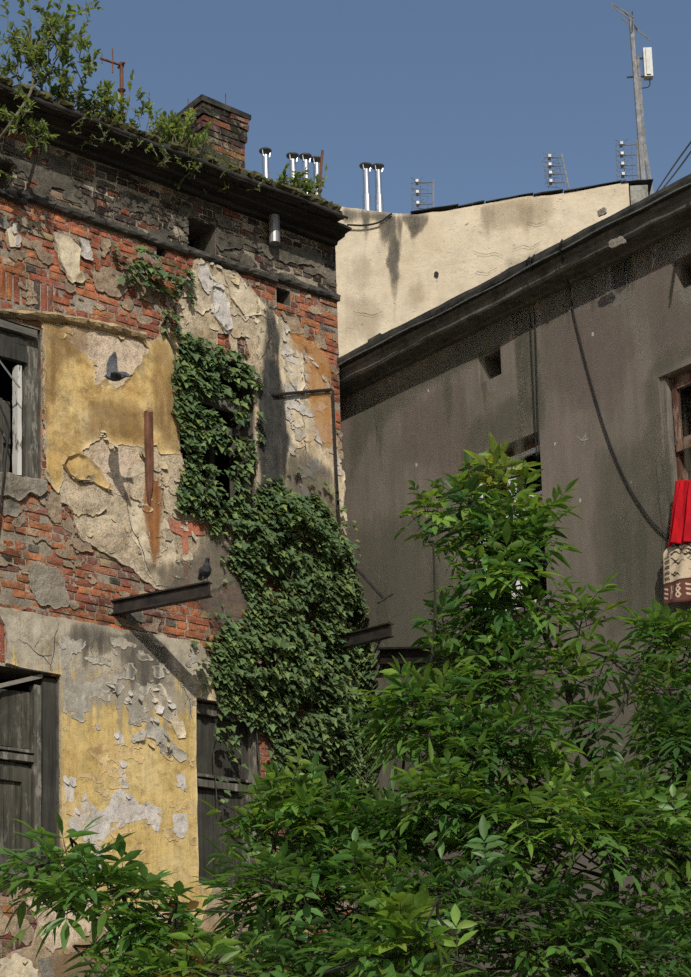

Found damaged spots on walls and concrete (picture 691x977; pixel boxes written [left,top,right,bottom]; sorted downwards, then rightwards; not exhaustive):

damp [344,208,428,280]
spalling [0,188,344,494]
damp [258,304,335,536]
corrosion [144,478,161,561]
spalling [0,428,212,869]
damp [62,626,182,725]
spalling [0,881,94,977]